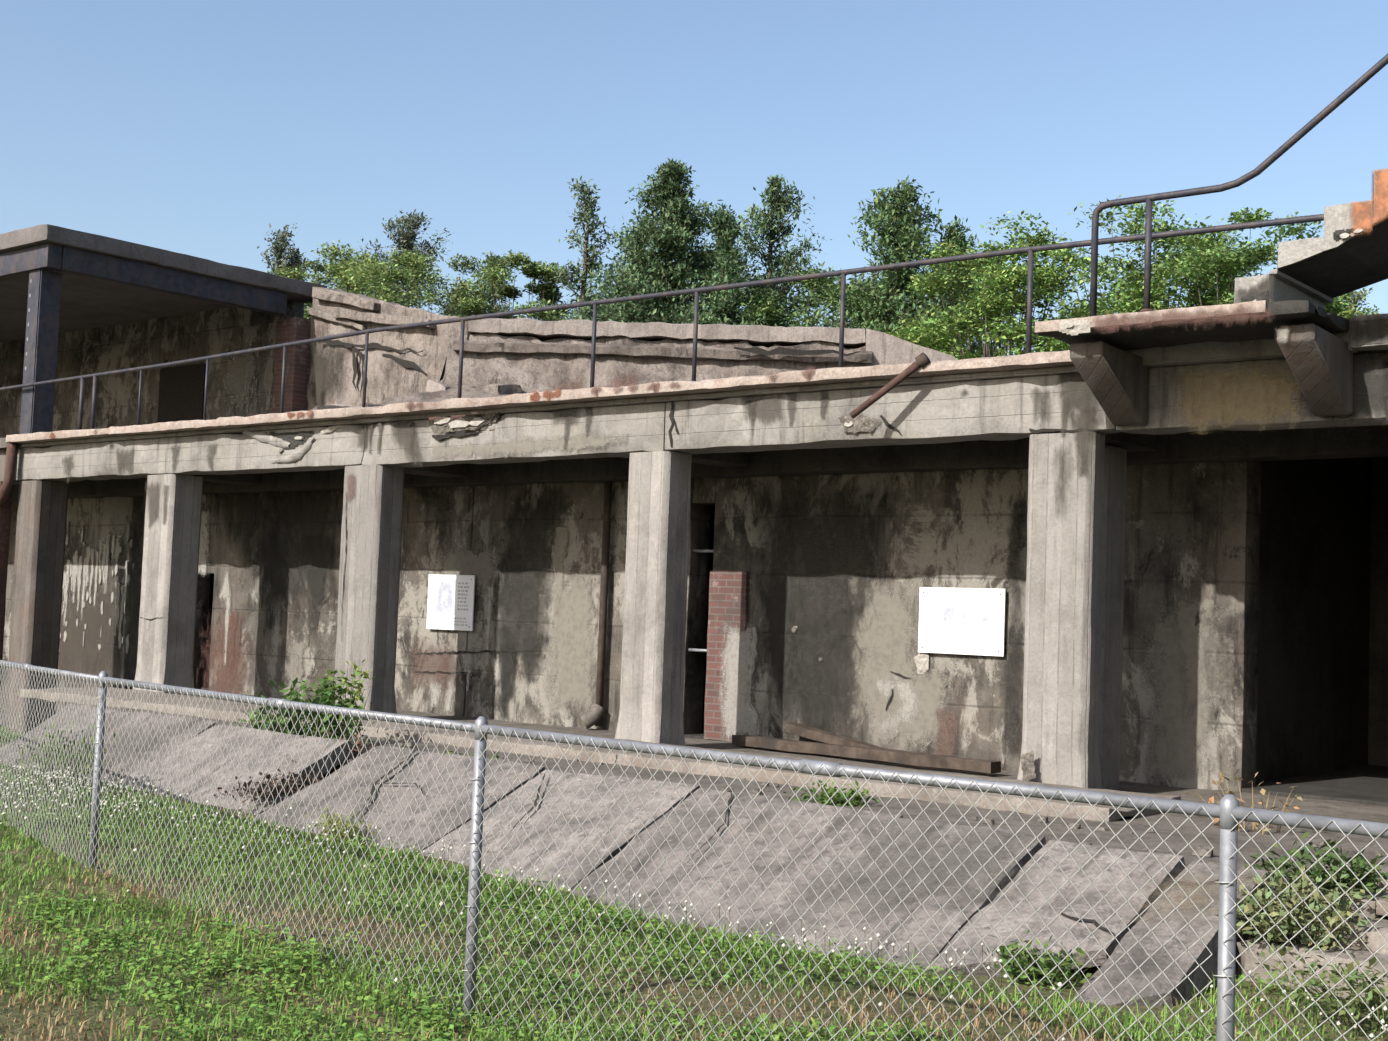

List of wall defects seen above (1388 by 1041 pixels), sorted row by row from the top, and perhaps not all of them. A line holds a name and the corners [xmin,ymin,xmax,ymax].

corrosion [1352,169,1388,231]
spalling [265,431,314,450]
crack [668,401,679,447]
peeling [57,519,139,688]
damp [431,496,598,727]
damp [759,488,957,756]
damp [1005,502,1024,753]
crack [347,747,427,824]
crack [1061,913,1115,934]